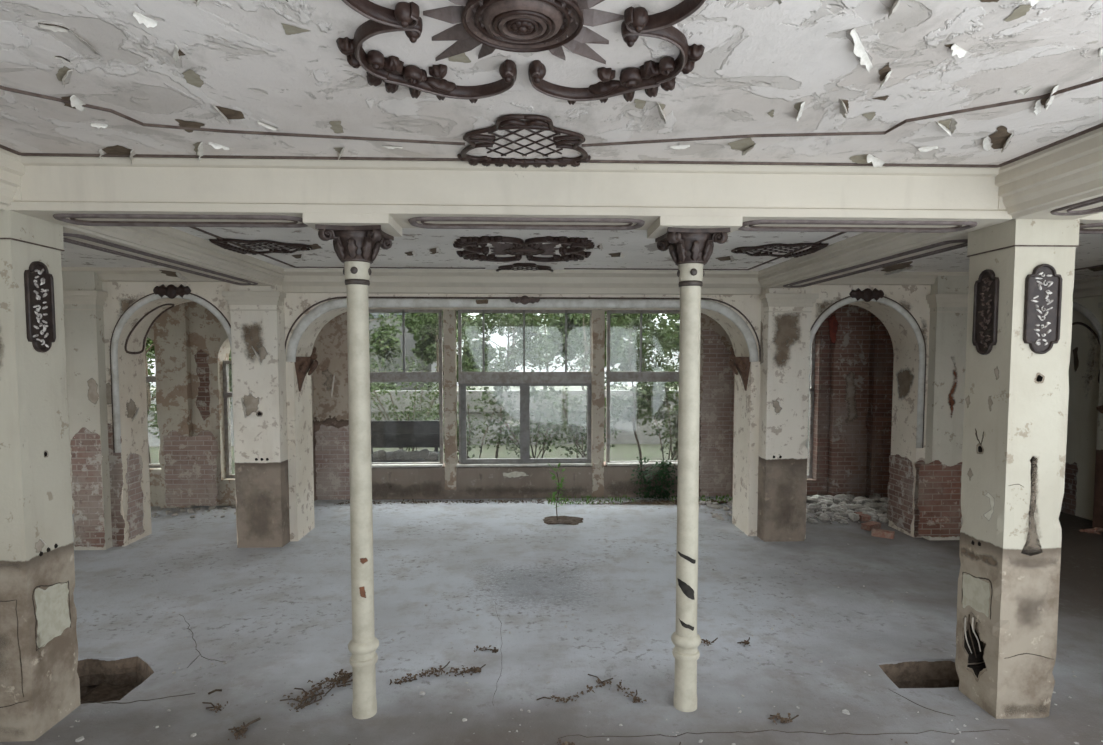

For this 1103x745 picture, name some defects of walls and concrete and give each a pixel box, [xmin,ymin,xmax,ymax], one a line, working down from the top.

peeling [56,66,108,129]
peeling [133,12,158,28]
peeling [175,119,230,162]
peeling [212,104,278,131]
peeling [846,28,892,120]
peeling [945,43,968,58]
peeling [982,126,1014,153]
peeling [1004,0,1040,22]
spalling [70,424,145,548]
spalling [887,454,973,538]
crack [80,614,223,704]
spalling [879,612,987,688]